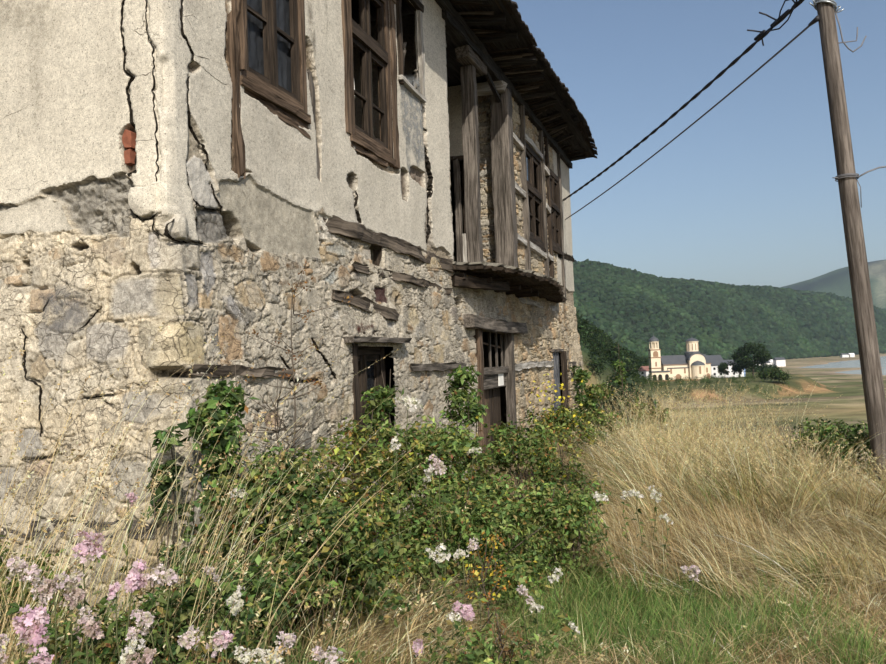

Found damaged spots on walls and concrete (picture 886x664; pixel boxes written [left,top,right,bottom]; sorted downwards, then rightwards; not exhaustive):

spalling [40,123,141,238]
crack [120,0,159,186]
crack [135,0,241,245]
peeling [186,106,366,259]
crack [353,191,361,223]
spalling [356,153,453,261]
crack [421,110,433,243]
crack [21,328,59,460]
crack [259,320,337,382]